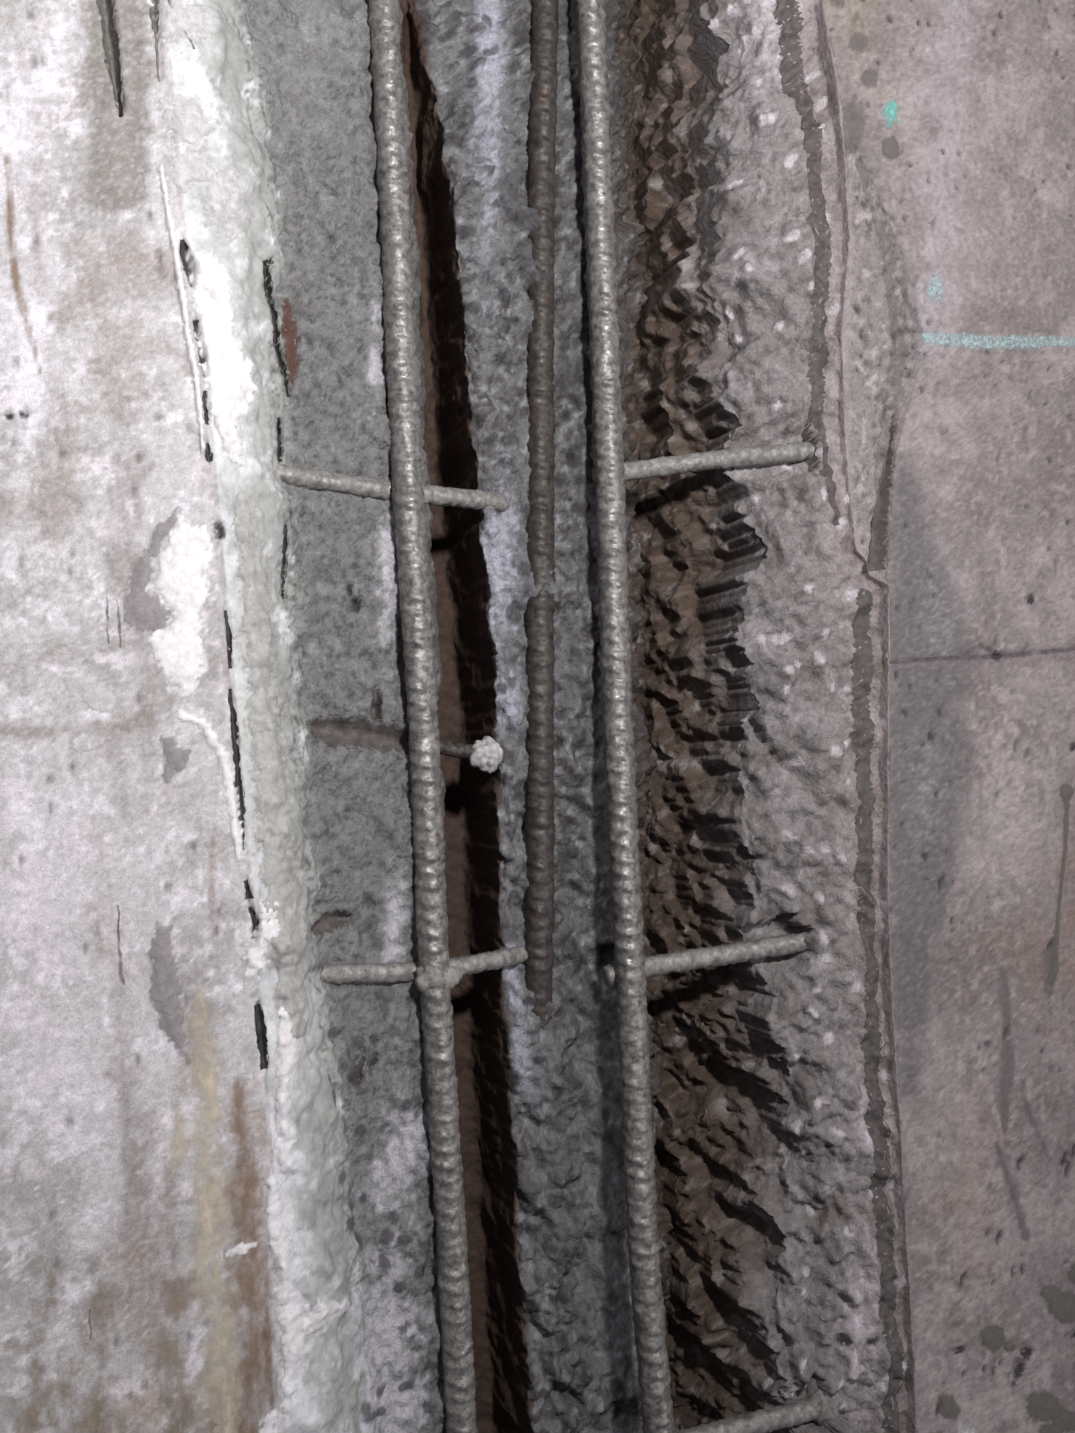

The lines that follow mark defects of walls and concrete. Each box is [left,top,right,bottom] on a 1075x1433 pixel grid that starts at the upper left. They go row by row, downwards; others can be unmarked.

crack [96,0,195,117]
crack [180,239,213,462]
crack [263,257,290,462]
crack [280,525,288,599]
crack [224,610,259,939]
spalling [124,0,447,1433]
spalling [398,0,643,1433]
spalling [605,0,925,1433]
crack [773,0,1073,1433]
crack [254,1004,269,1070]
water stain [996,1042,1029,1239]